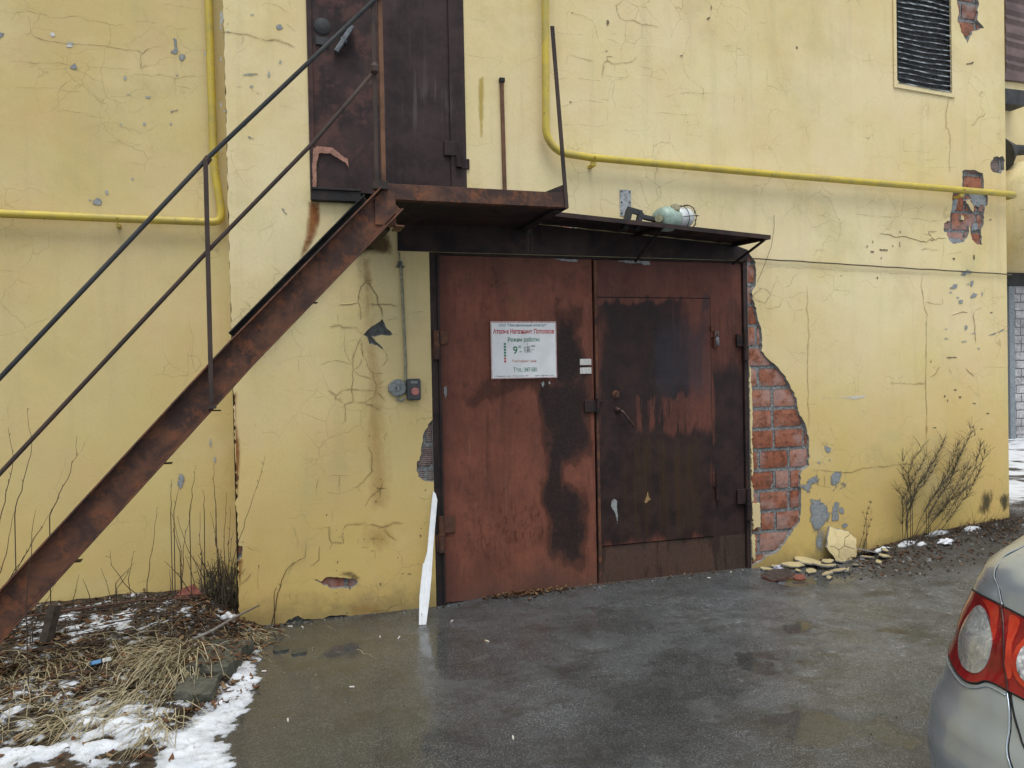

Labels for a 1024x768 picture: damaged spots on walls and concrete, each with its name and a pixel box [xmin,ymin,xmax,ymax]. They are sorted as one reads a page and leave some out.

crack [22,3,204,145]
crack [562,2,704,131]
flaking render [957,0,984,43]
rust [303,203,319,251]
flaking render [944,156,1005,304]
flaking render [364,319,393,349]
crack [289,275,423,613]
flaking render [417,421,433,491]
flaking render [742,254,848,565]
flaking render [316,561,358,590]